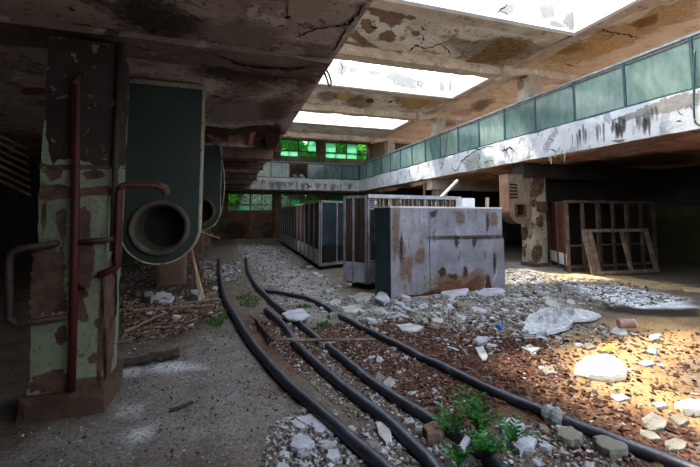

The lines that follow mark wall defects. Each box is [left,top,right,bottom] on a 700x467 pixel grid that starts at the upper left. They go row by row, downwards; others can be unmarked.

crack [284,3,366,76]
crack [408,26,450,54]
water stain [443,37,542,64]
crack [601,29,639,40]
water stain [636,107,658,134]
spalling [205,119,290,159]
water stain [570,118,700,167]
crack [450,146,527,175]
peeling [27,164,126,393]